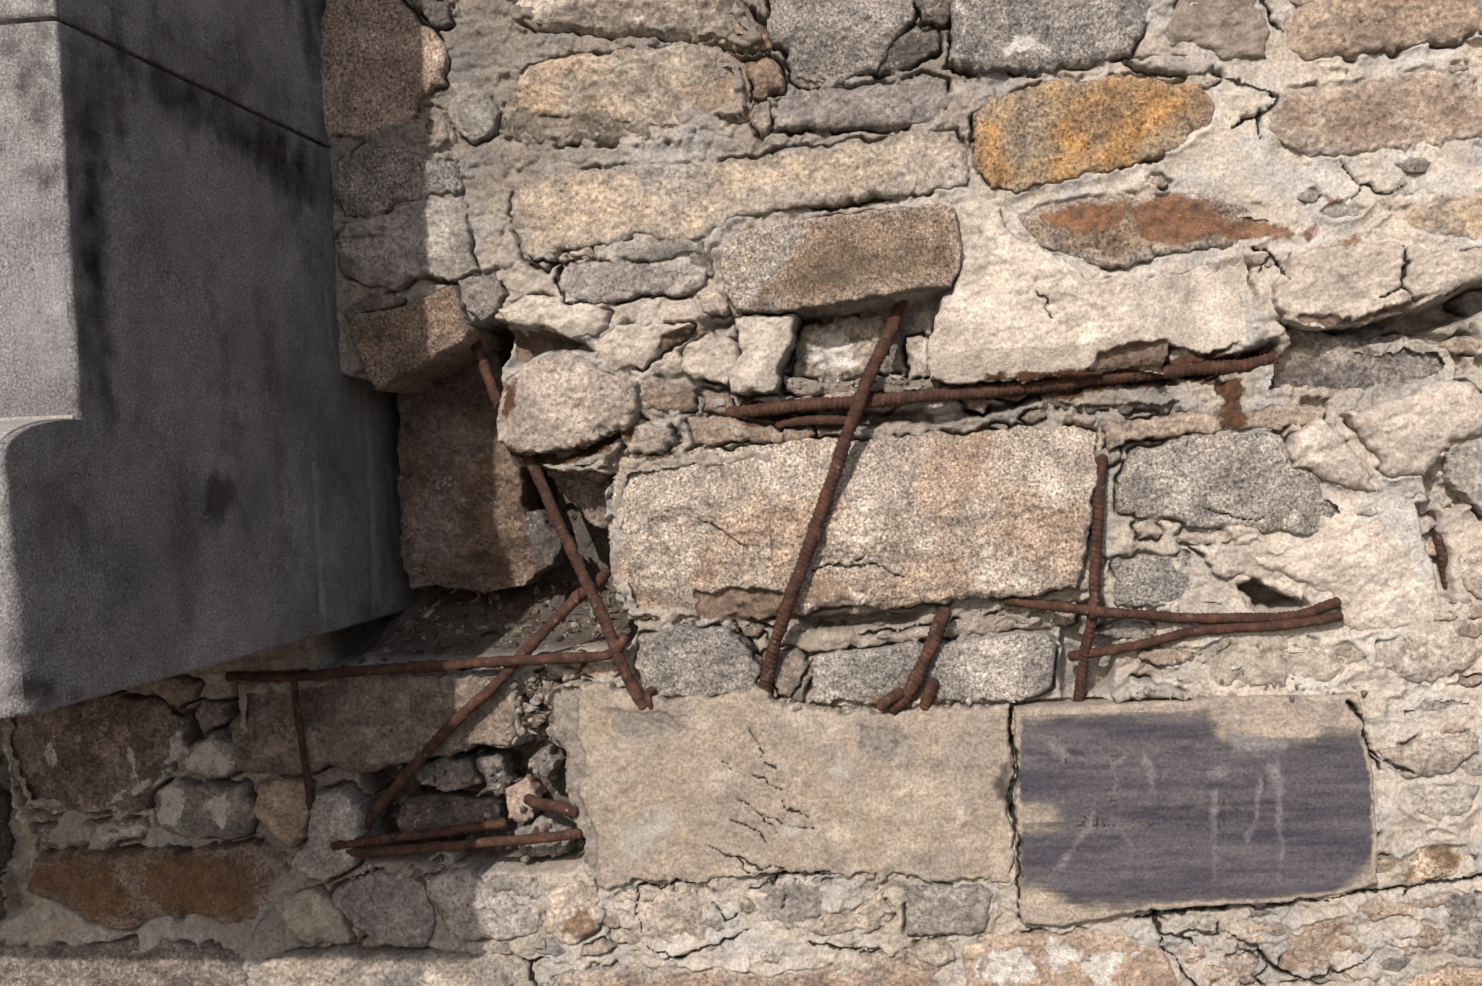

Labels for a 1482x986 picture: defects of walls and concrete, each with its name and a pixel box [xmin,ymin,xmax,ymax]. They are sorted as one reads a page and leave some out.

leakage [48,4,323,408]
spalling [471,339,502,416]
corrosion [501,382,516,415]
spalling [511,330,582,363]
corrosion [505,426,634,468]
corrosion [741,398,789,430]
corrosion [985,348,1270,428]
leakage [363,386,407,607]
leakage [22,668,54,702]
spalling [225,454,683,879]
crack [634,727,831,959]
crack [1134,873,1482,986]